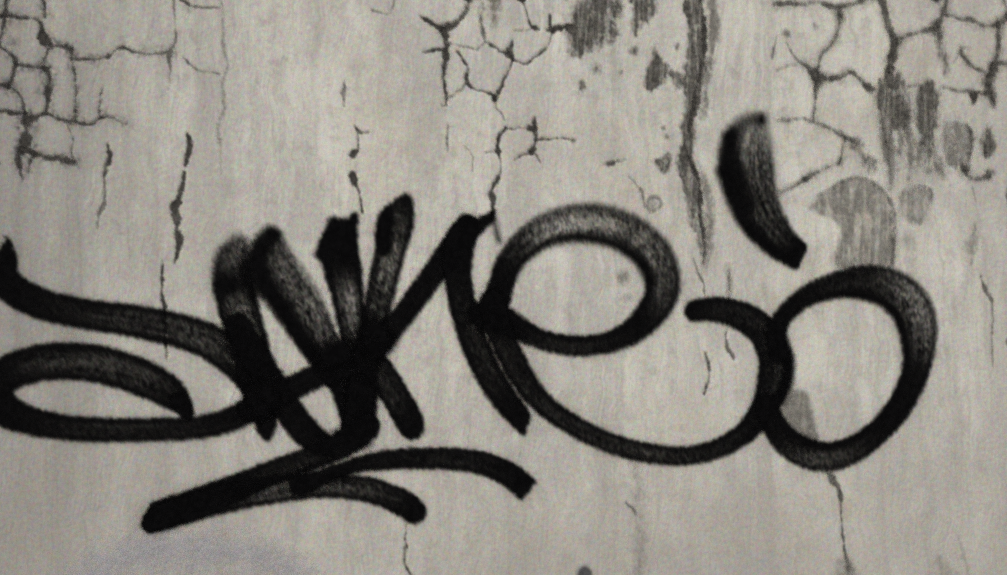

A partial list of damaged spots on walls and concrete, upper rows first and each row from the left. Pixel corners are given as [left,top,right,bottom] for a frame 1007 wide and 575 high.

crack [0,0,216,227]
crack [421,0,575,209]
crack [771,0,1007,193]
crack [160,133,193,310]